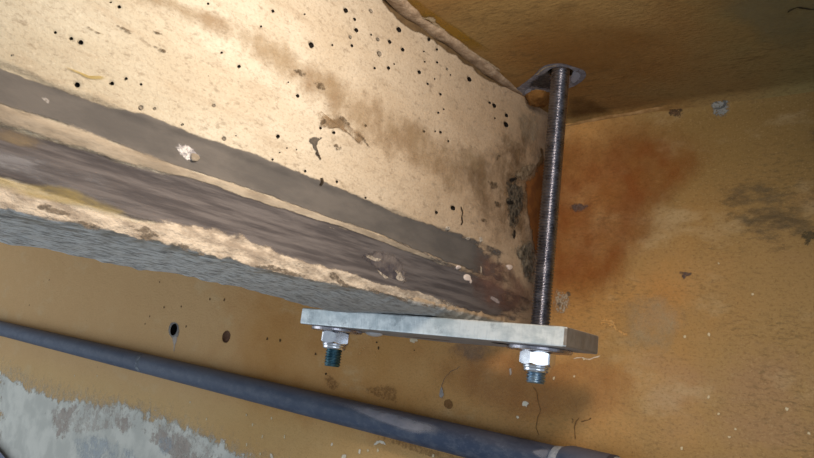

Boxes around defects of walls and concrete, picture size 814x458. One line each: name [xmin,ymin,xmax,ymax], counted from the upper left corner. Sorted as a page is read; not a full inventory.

damp [506,177,524,239]
peeling [0,372,251,458]